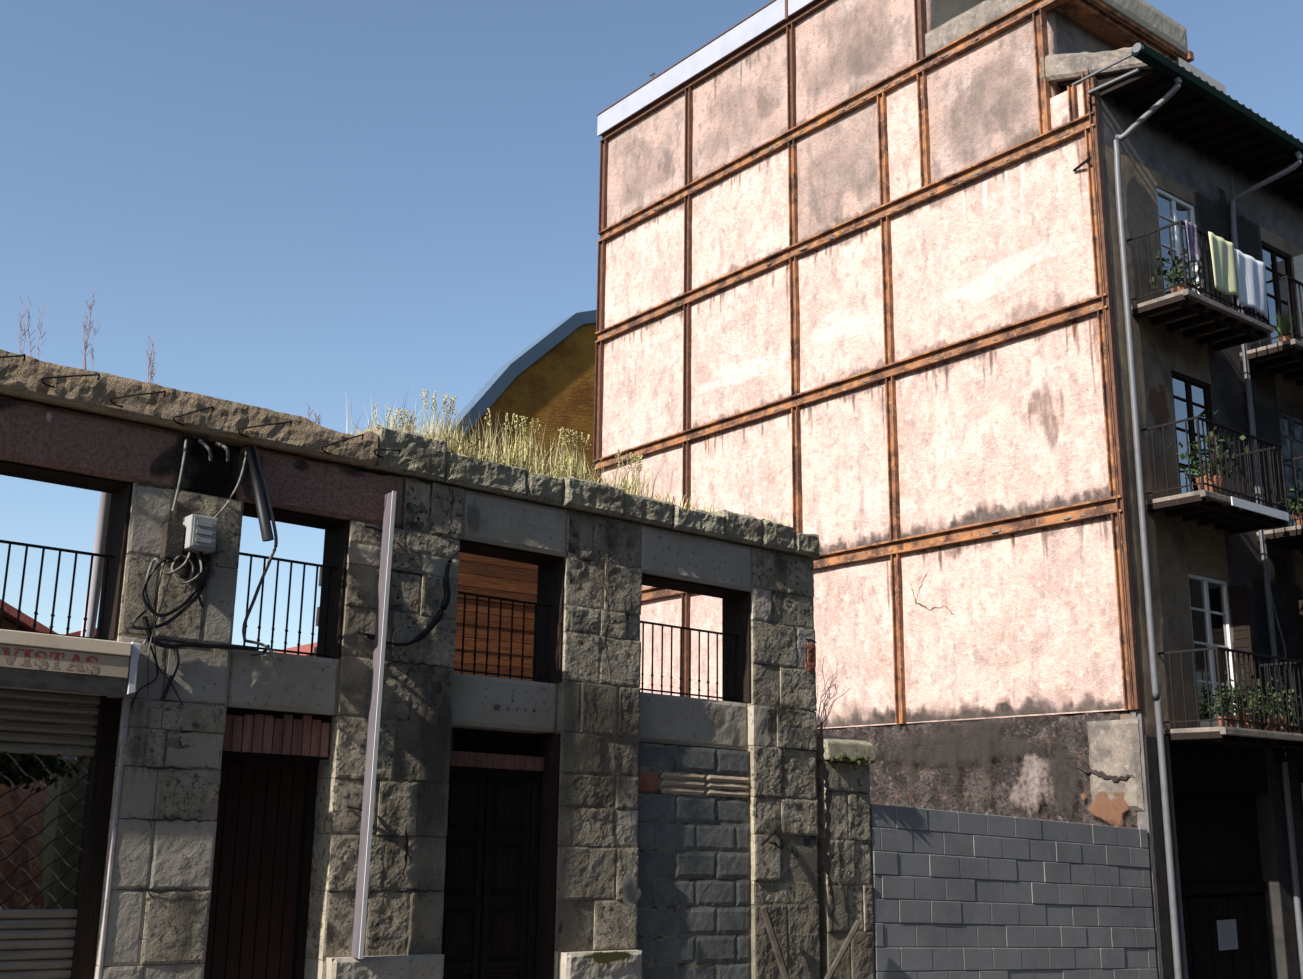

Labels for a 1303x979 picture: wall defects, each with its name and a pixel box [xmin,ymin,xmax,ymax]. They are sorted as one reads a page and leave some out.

water stain [820,528,925,554]
water stain [940,488,1110,561]
water stain [766,702,795,739]
water stain [818,698,1122,784]
flaking render [1010,719,1144,827]